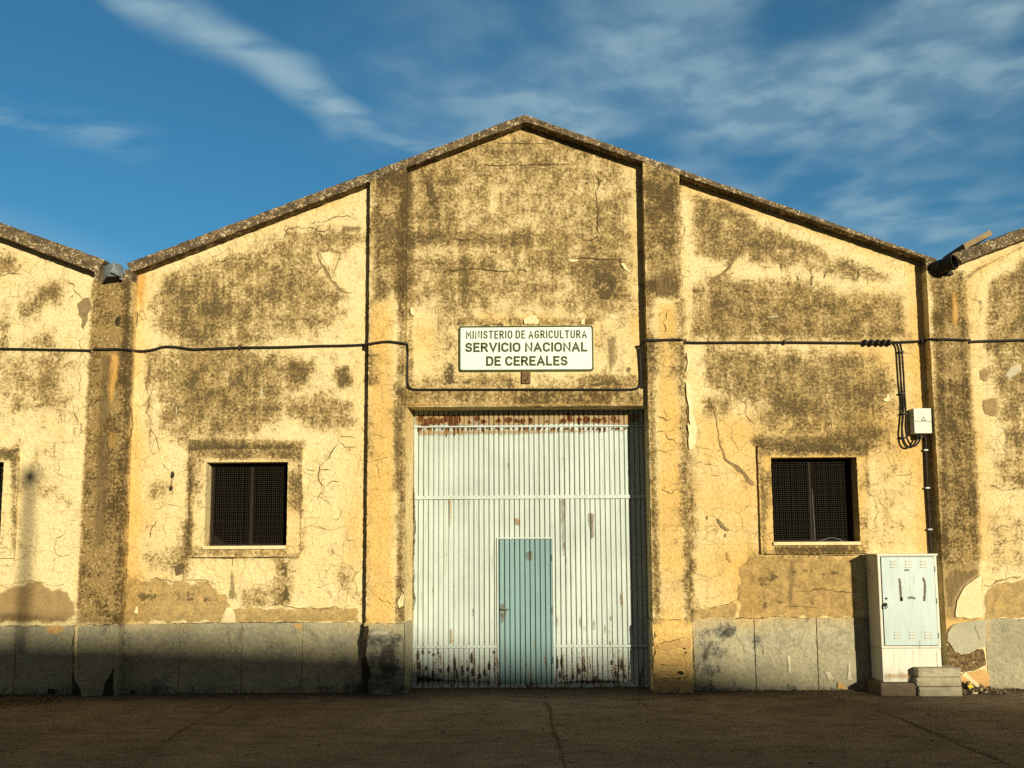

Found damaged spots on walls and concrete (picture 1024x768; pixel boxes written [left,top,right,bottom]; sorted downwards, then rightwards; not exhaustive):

damp [425,181,441,225]
crack [389,169,631,275]
crack [216,215,356,293]
damp [593,270,617,299]
corrosion [406,403,639,437]
crack [658,353,832,517]
crack [304,434,388,541]
peeling [224,607,235,623]
peeling [956,576,983,619]
spalling [947,645,990,688]